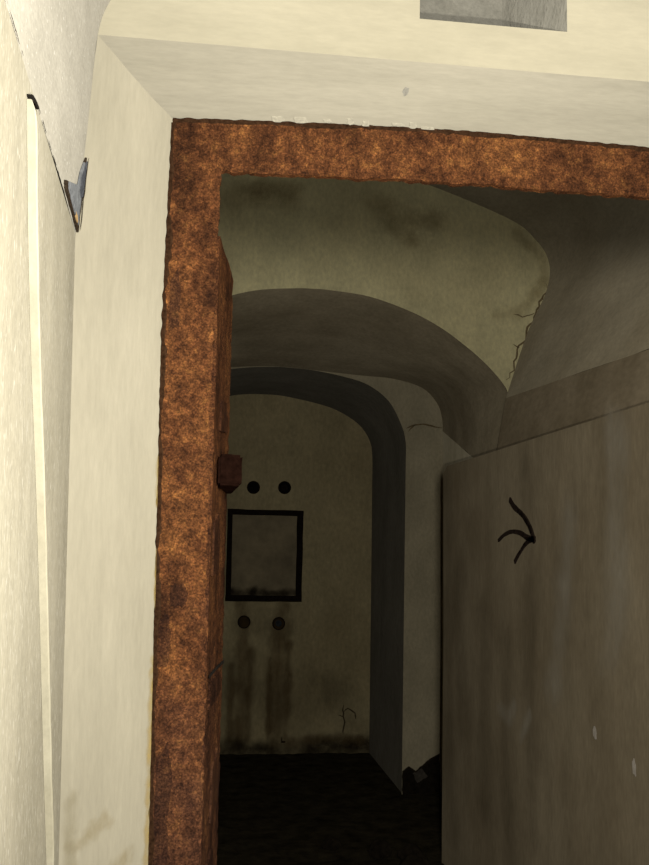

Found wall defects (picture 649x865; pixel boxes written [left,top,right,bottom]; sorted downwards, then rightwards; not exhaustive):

flaking render [64,158,89,232]
crack [506,284,548,380]
corrosion [145,118,649,865]